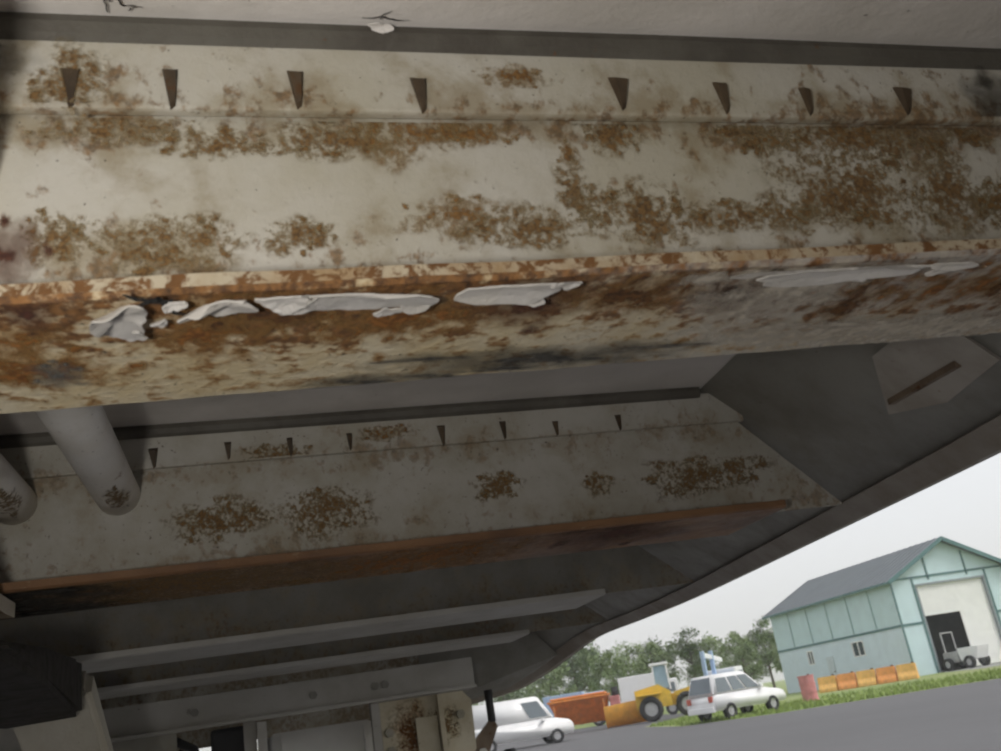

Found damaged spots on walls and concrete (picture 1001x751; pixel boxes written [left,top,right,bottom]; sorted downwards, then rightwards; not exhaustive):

rust [473,64,542,88]
rust [25,45,520,171]
rust [402,124,1001,250]
rust [0,208,248,278]
rust [264,215,338,257]
peeling [89,293,439,342]
rust [153,286,475,355]
peeling [454,281,583,307]
rust [495,271,767,316]
rust [818,261,1001,317]
rust [641,455,768,498]
rust [172,486,376,545]